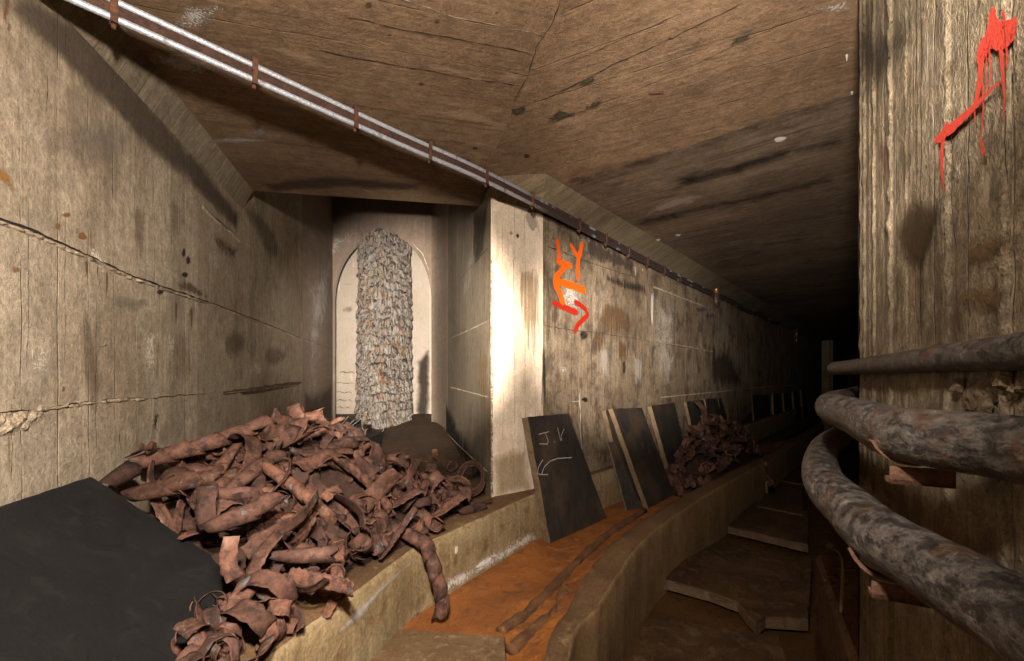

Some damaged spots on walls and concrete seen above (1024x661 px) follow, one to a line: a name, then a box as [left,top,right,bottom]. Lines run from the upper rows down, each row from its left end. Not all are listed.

crack [319,2,792,165]
crack [23,202,31,369]
water stain [900,202,937,263]